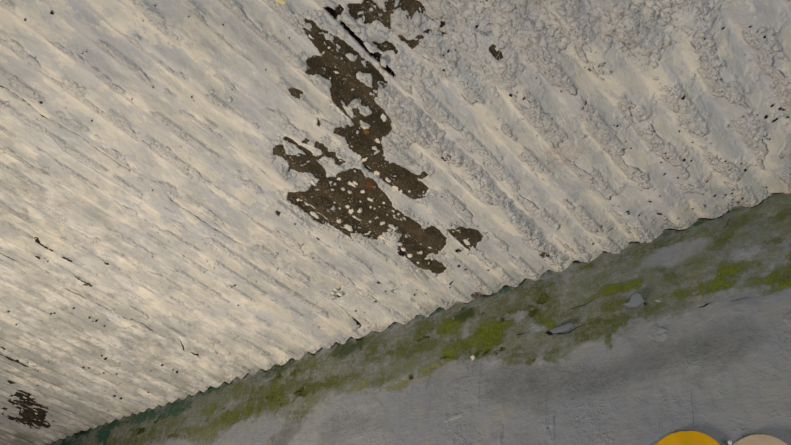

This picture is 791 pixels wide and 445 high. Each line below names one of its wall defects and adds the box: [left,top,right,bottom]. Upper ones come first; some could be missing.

peeling [265,0,733,285]
peeling [1,380,55,429]